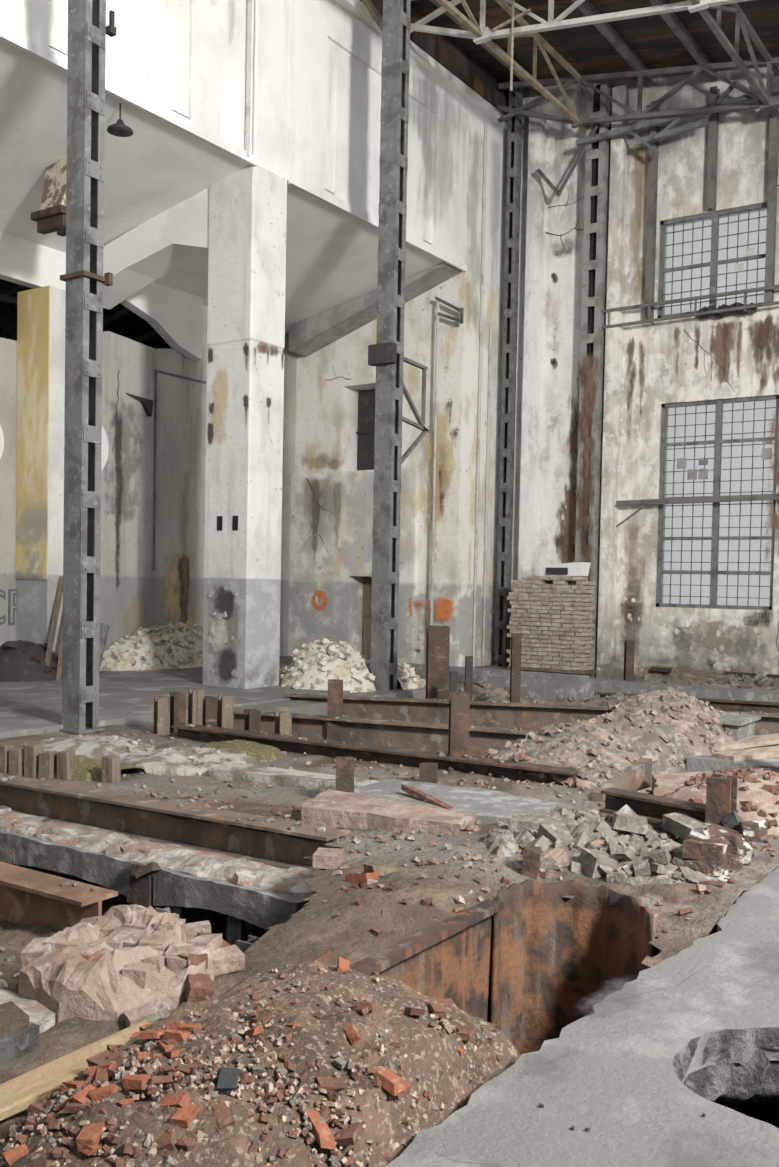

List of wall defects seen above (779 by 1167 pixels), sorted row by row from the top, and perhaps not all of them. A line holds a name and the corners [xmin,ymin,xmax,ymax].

corrosion [695,315,779,390]
corrosion [555,355,598,590]
corrosion [769,414,779,487]
corrosion [765,500,779,559]
damp [165,557,192,625]
spalling [207,585,239,680]